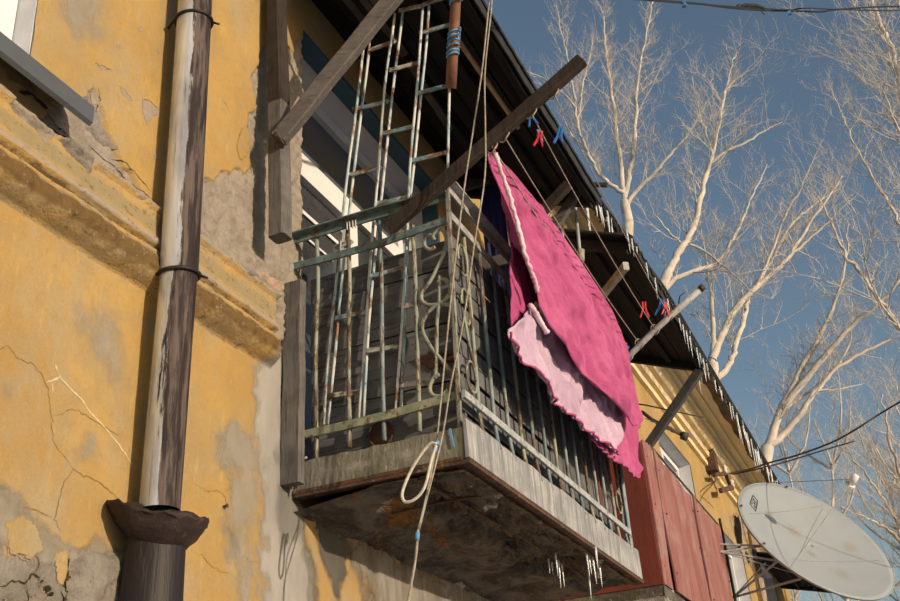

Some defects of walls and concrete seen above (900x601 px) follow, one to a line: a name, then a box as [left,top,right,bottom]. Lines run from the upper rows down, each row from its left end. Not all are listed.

flaking render [10,87,163,210]
flaking render [201,32,304,343]
rust [420,353,454,368]
crack [1,345,120,528]
flaking render [0,516,87,601]
rust [382,497,462,554]